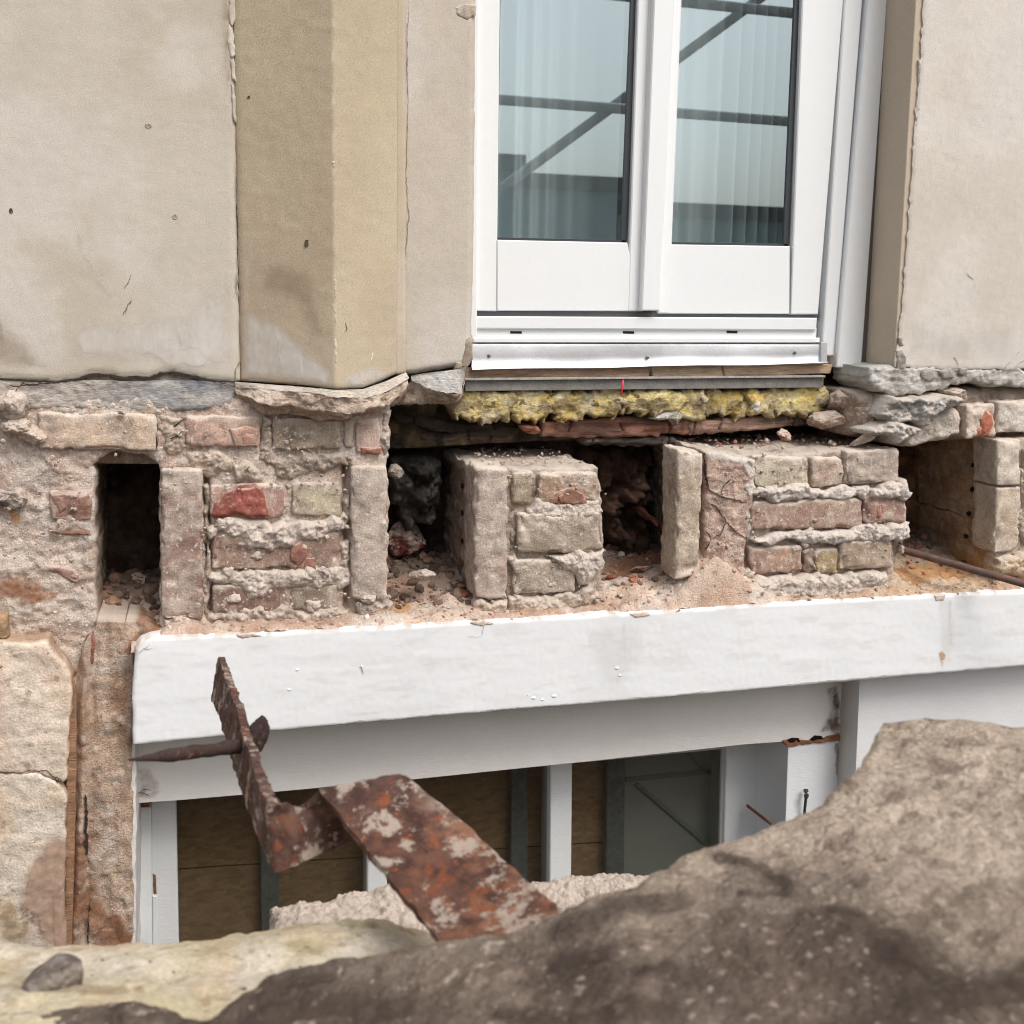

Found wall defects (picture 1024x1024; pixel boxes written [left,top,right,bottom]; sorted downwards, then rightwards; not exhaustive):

crack [403,1,411,268]
spalling [230,426,259,447]
spalling [49,490,92,535]
spalling [210,482,269,519]
crack [703,453,747,549]
spalling [38,565,81,583]
spalling [290,542,316,570]